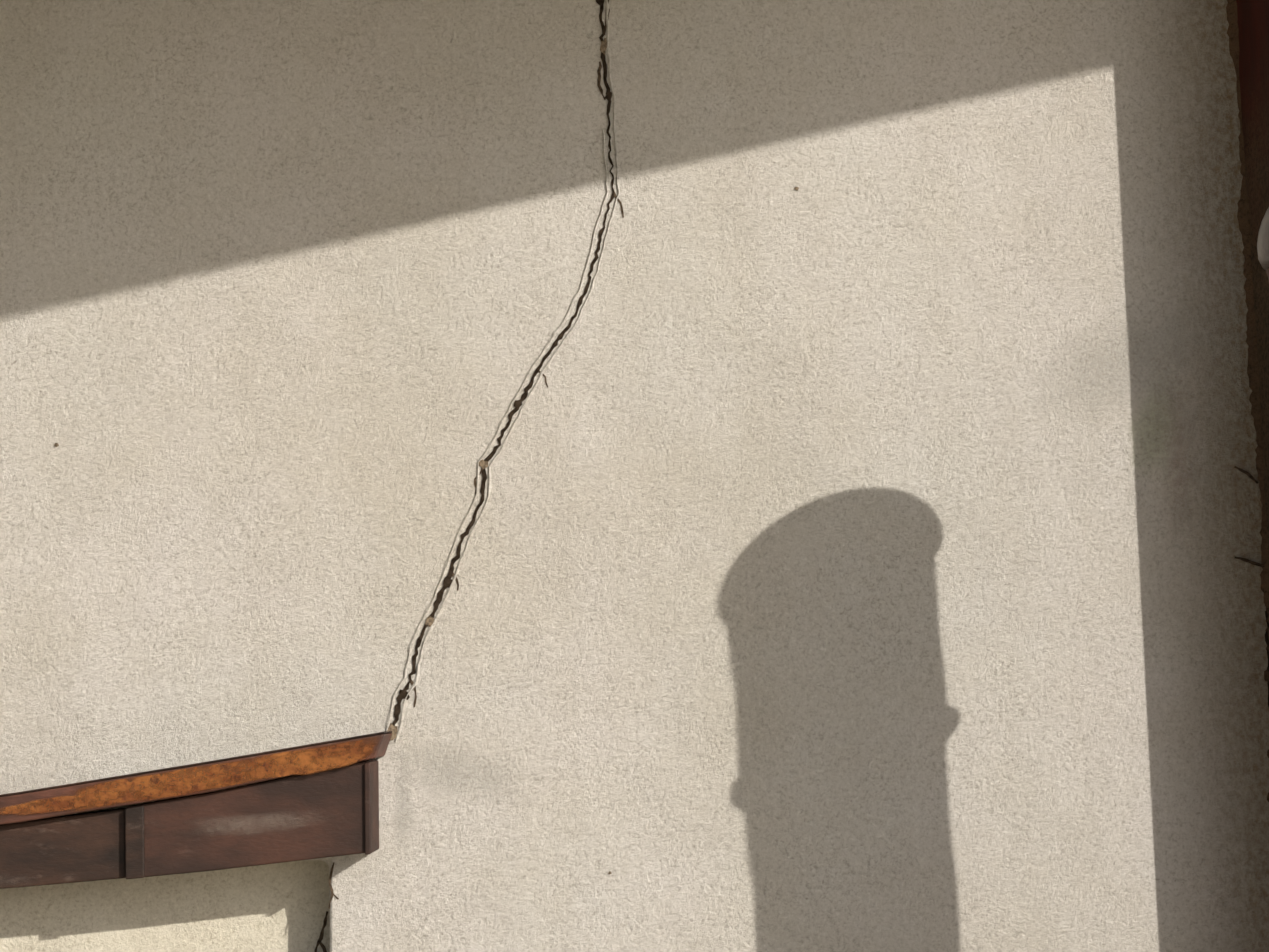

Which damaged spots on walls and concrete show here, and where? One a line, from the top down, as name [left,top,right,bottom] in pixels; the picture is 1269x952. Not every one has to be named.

crack [385,0,624,742]
corrosion [0,740,374,815]